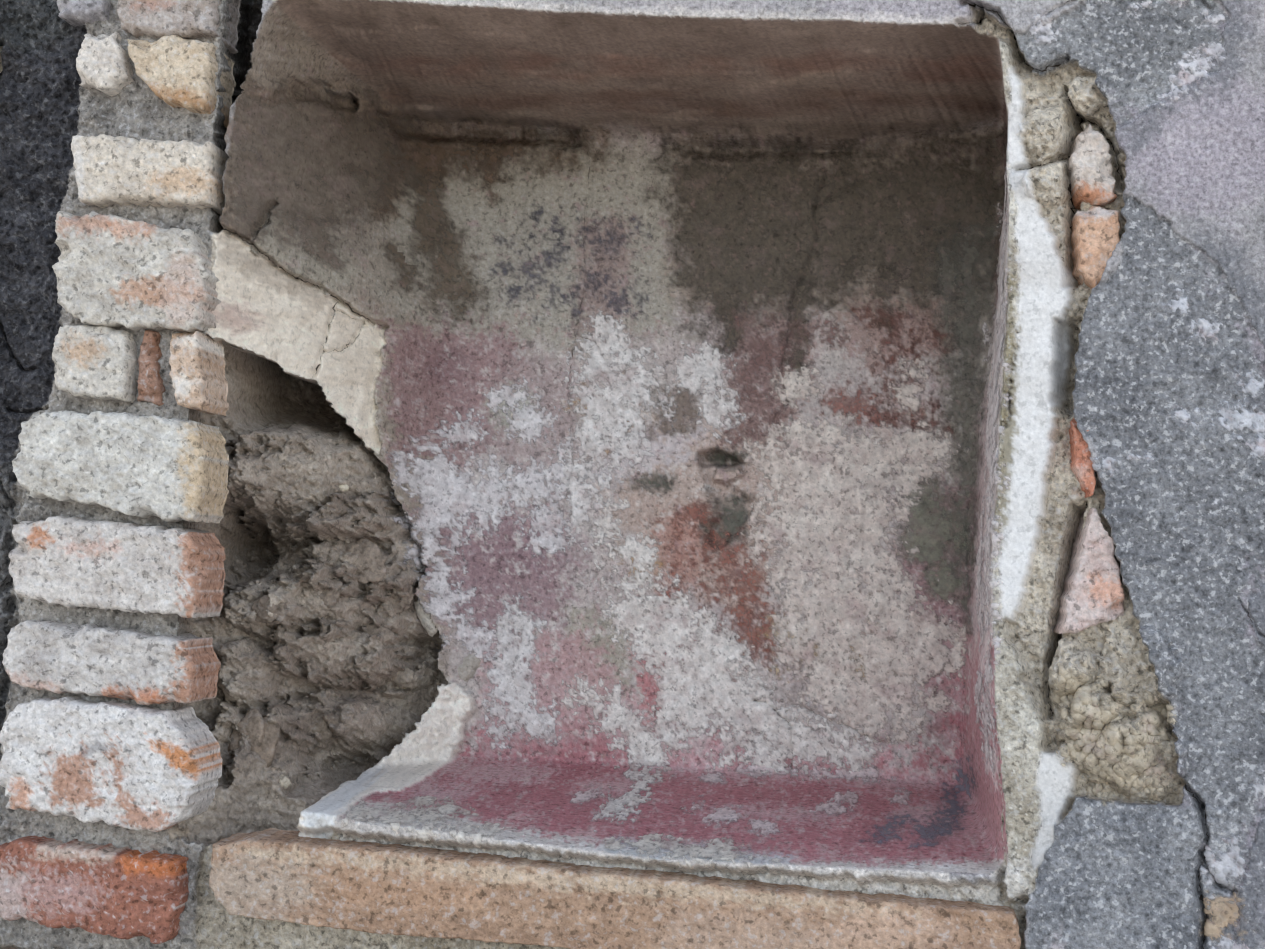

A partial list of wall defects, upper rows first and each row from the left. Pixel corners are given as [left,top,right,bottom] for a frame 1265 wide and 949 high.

crack [224,209,382,379]
leakage [223,85,604,321]
leakage [491,204,652,320]
spalling [168,229,969,870]
spalling [972,0,1265,949]
crack [1185,784,1222,949]